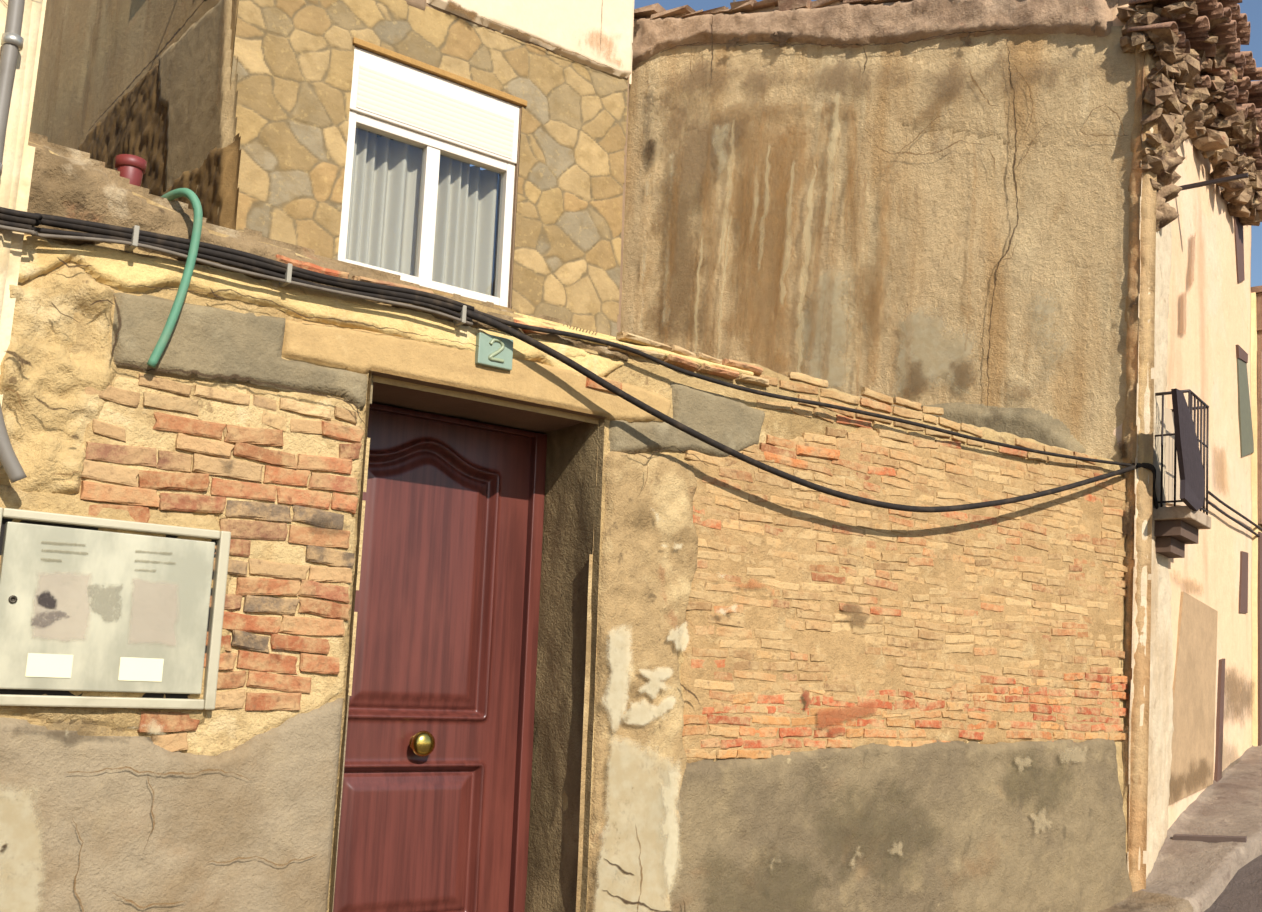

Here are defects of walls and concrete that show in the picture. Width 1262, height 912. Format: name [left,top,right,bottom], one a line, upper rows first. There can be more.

water stain [640,105,744,333]
crack [660,17,1044,406]
spalling [5,351,31,366]
spalling [4,387,68,412]
spalling [90,295,122,356]
water stain [799,268,850,387]
water stain [898,310,974,396]
flaking render [56,374,365,711]
flaking render [596,372,1134,912]
flaking render [137,696,200,752]